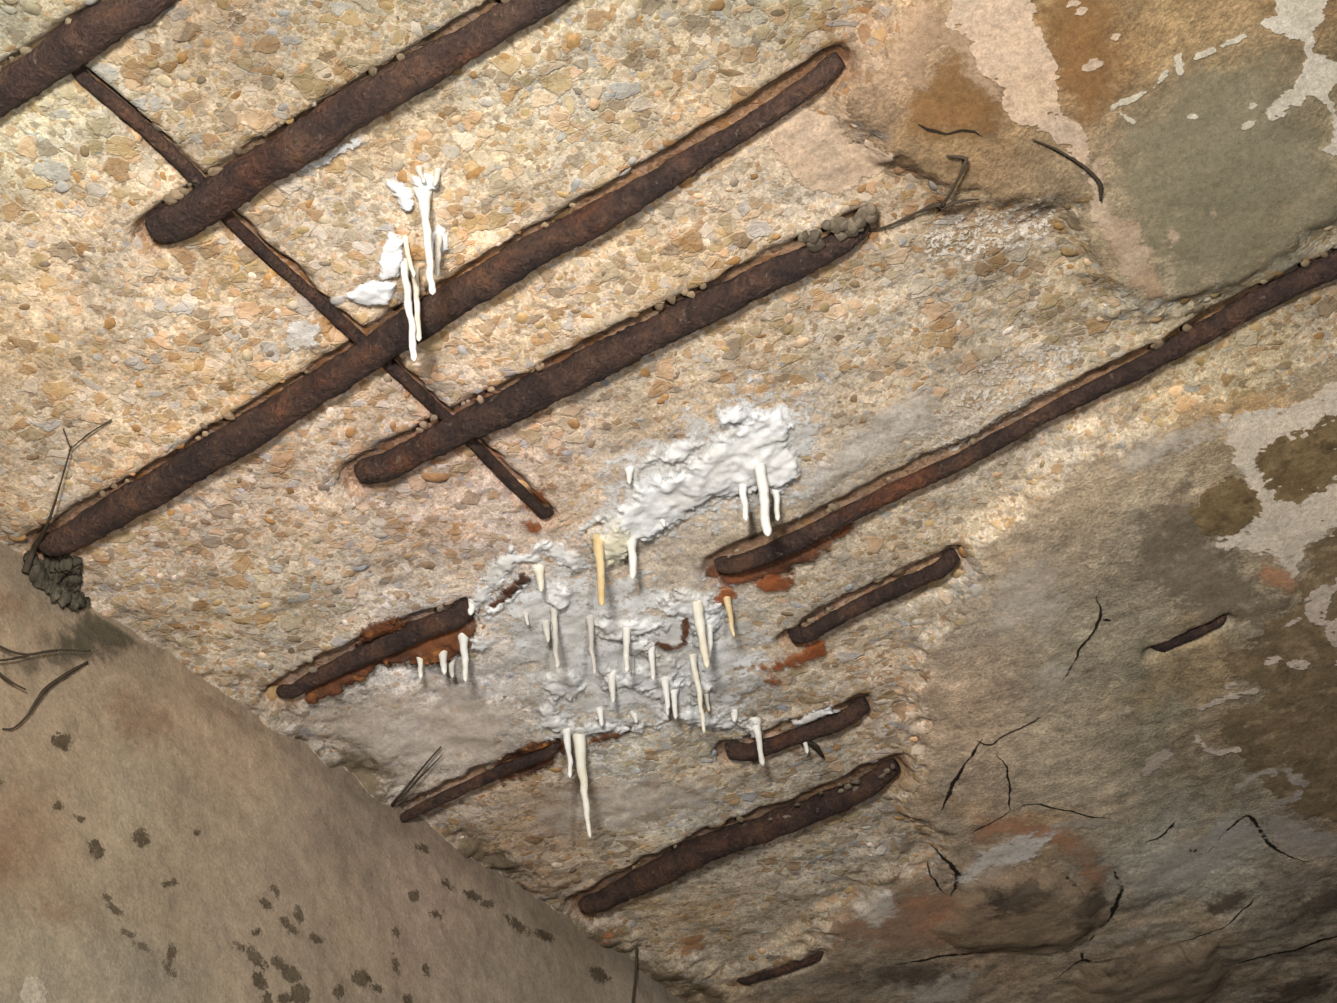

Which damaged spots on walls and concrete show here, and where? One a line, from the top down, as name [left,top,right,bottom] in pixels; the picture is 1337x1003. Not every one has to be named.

spalling [84,0,510,178]
spalling [232,0,1108,336]
spalling [0,73,355,560]
efflorescence [343,165,449,361]
corrosion [304,616,480,704]
corrosion [488,572,532,608]
leakage [328,336,1084,838]
corrosion [705,523,853,604]
crack [1063,596,1111,680]
leakage [1134,414,1337,822]
crack [941,716,1108,833]
crack [1147,815,1308,862]